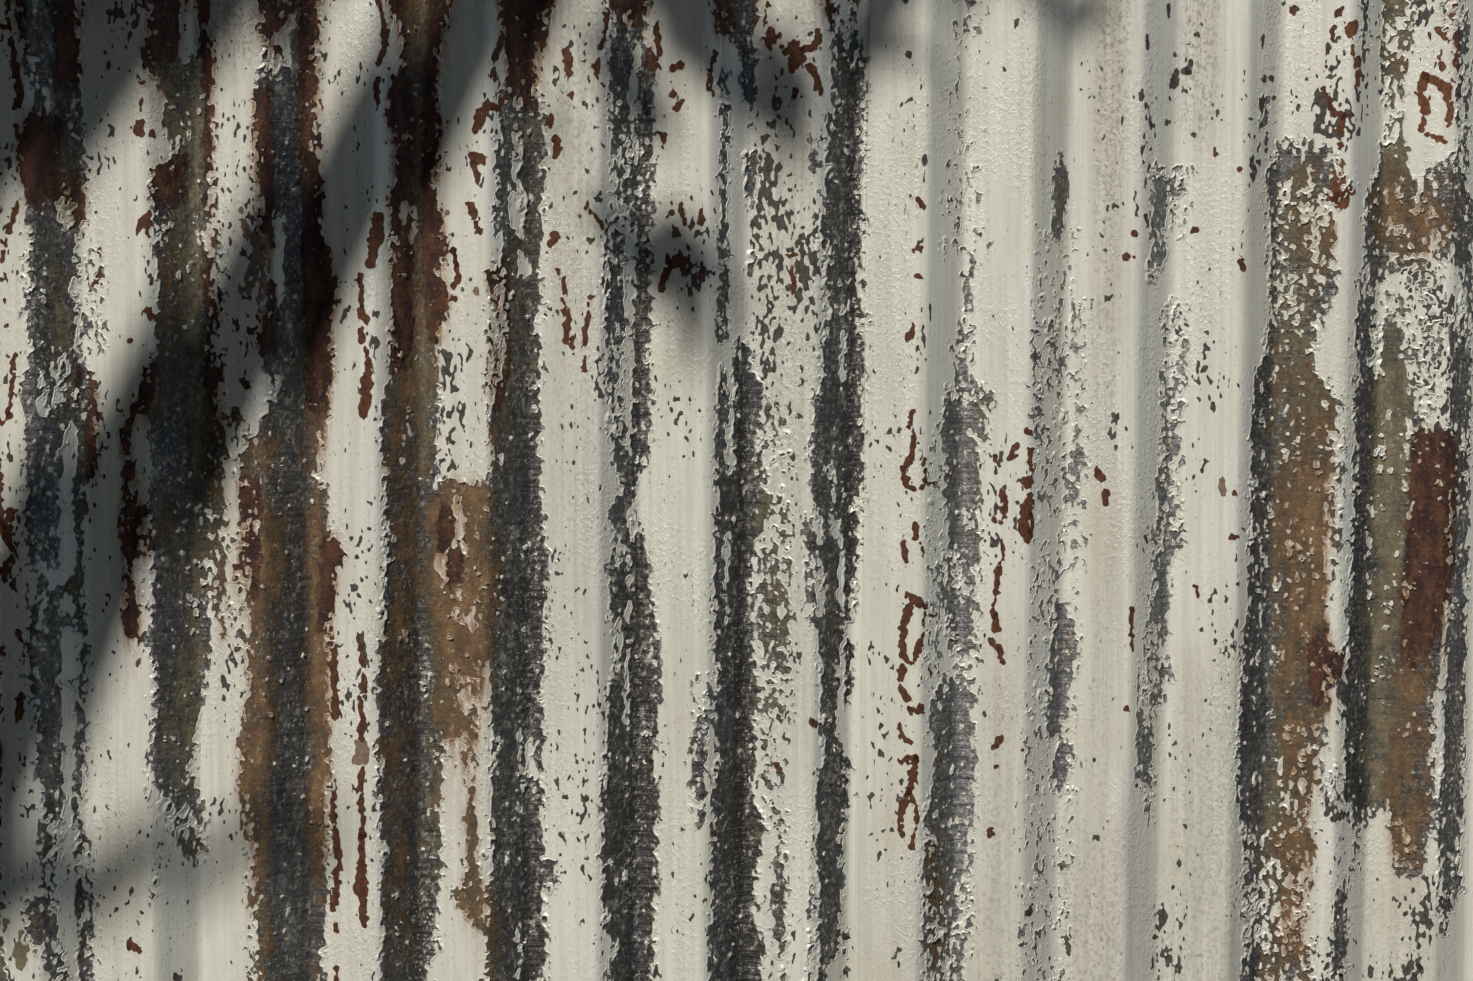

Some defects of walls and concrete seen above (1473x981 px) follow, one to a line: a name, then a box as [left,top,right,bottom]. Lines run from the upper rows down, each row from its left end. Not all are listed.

rust [133,80,156,138]
rust [1325,158,1356,211]
rust [357,211,385,420]
peeling [1107,412,1133,451]
peeling [0,0,1125,981]
rust [989,427,1034,544]
rust [907,703,924,715]
rust [991,734,1004,769]